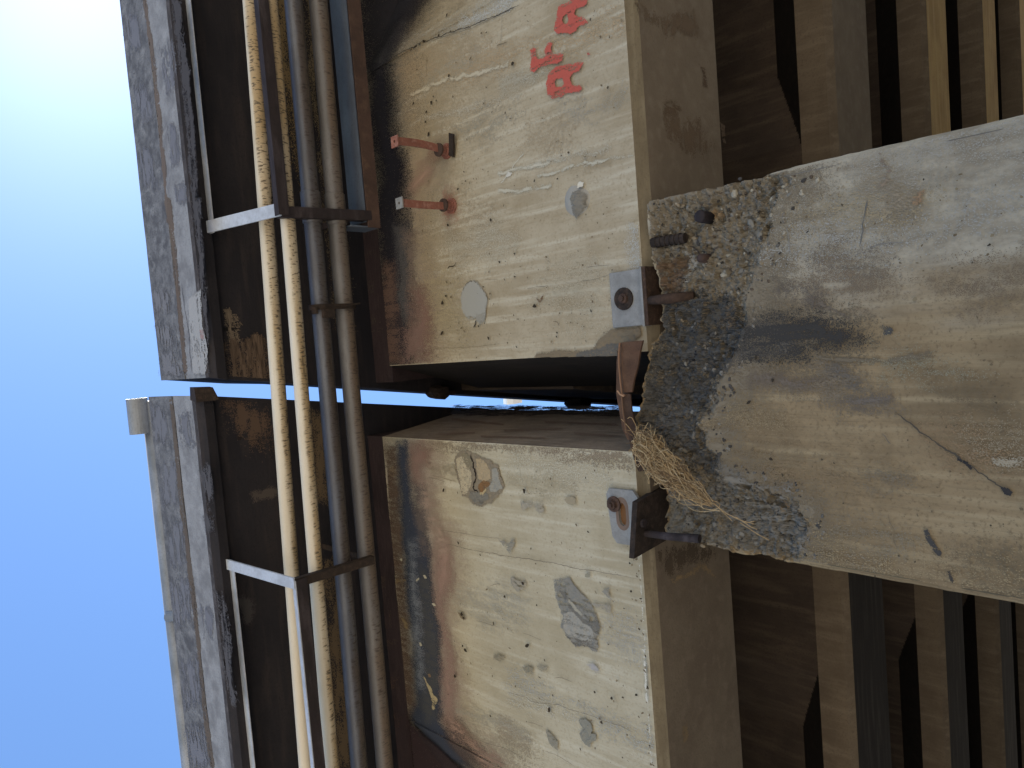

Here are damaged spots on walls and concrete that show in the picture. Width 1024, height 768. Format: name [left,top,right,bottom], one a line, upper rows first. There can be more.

water stain [380,0,640,364]
spalling [570,190,588,218]
spalling [454,450,505,507]
spalling [503,548,642,652]
spalling [637,171,826,562]
water stain [698,331,1024,597]